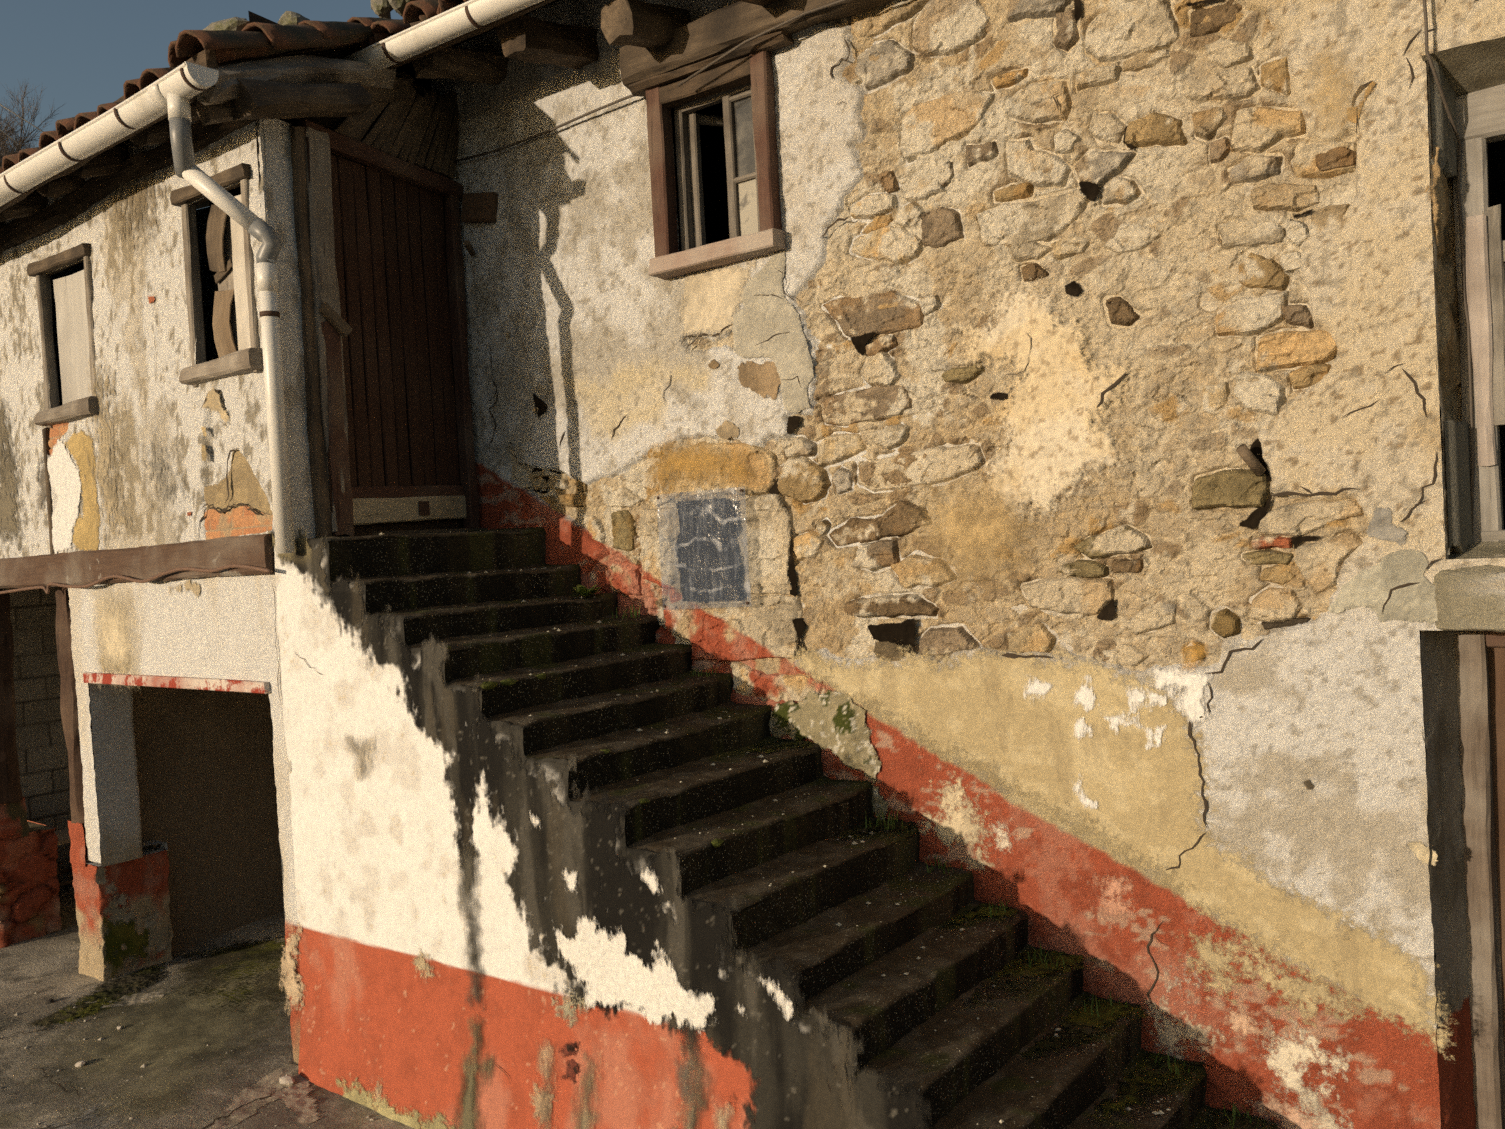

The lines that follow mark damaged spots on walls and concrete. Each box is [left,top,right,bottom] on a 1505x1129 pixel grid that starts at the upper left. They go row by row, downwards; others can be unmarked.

crack [1403,0,1476,88]
crack [1351,81,1372,133]
flaking render [48,423,100,551]
flaking render [187,448,273,540]
spalling [769,479,797,596]
spalling [1236,438,1273,530]
damp [458,848,483,1002]
flaking render [791,618,1450,1129]
crack [1146,921,1169,1008]
damp [456,1023,493,1129]
damp [576,1055,596,1129]
damp [677,1020,728,1129]